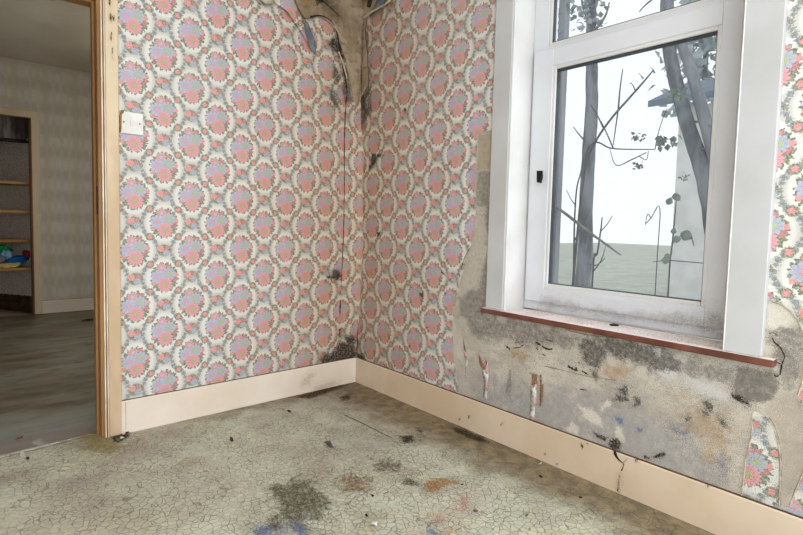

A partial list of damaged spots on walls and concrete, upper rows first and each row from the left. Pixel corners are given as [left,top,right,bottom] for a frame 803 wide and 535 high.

flaking render [295,0,377,106]
leakage [328,33,373,130]
mould [319,333,367,363]
flaking render [452,130,803,510]
leakage [455,132,803,503]
crack [769,333,786,377]